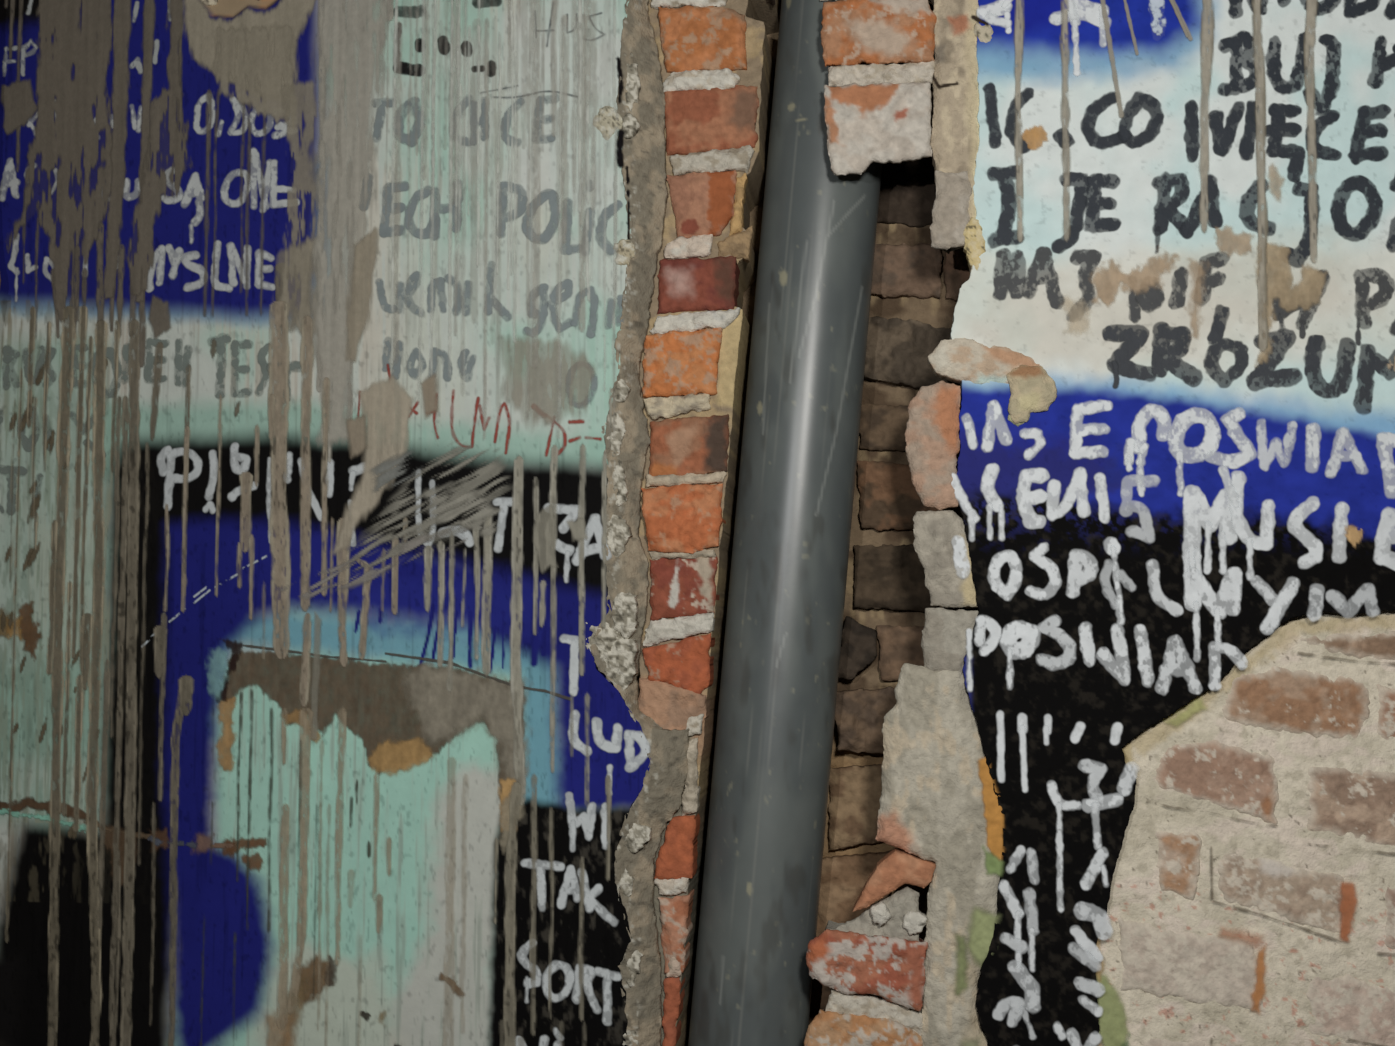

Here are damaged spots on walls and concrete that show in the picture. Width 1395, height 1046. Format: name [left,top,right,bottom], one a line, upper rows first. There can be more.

water stain [431,0,480,260]
water stain [574,0,590,300]
flaking render [930,0,994,278]
water stain [1067,254,1203,336]
water stain [1216,227,1325,363]
water stain [1270,166,1282,198]
spalling [586,0,782,1046]
peeling [210,640,527,847]
flaking render [875,381,1004,1046]
flaking render [1096,611,1395,1046]